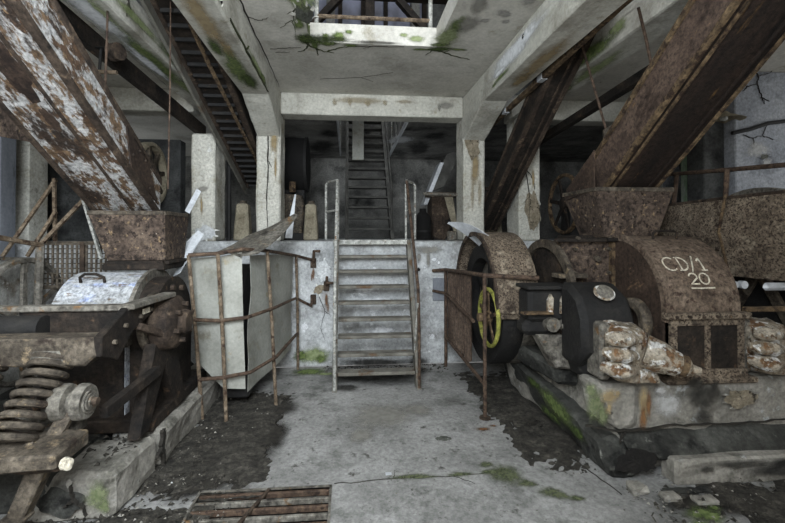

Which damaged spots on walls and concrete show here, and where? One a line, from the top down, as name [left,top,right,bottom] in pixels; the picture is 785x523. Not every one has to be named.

damp [69,0,125,36]
damp [460,0,488,31]
damp [129,47,165,77]
rust [0,41,62,132]
crack [743,71,772,104]
rust [640,390,651,426]